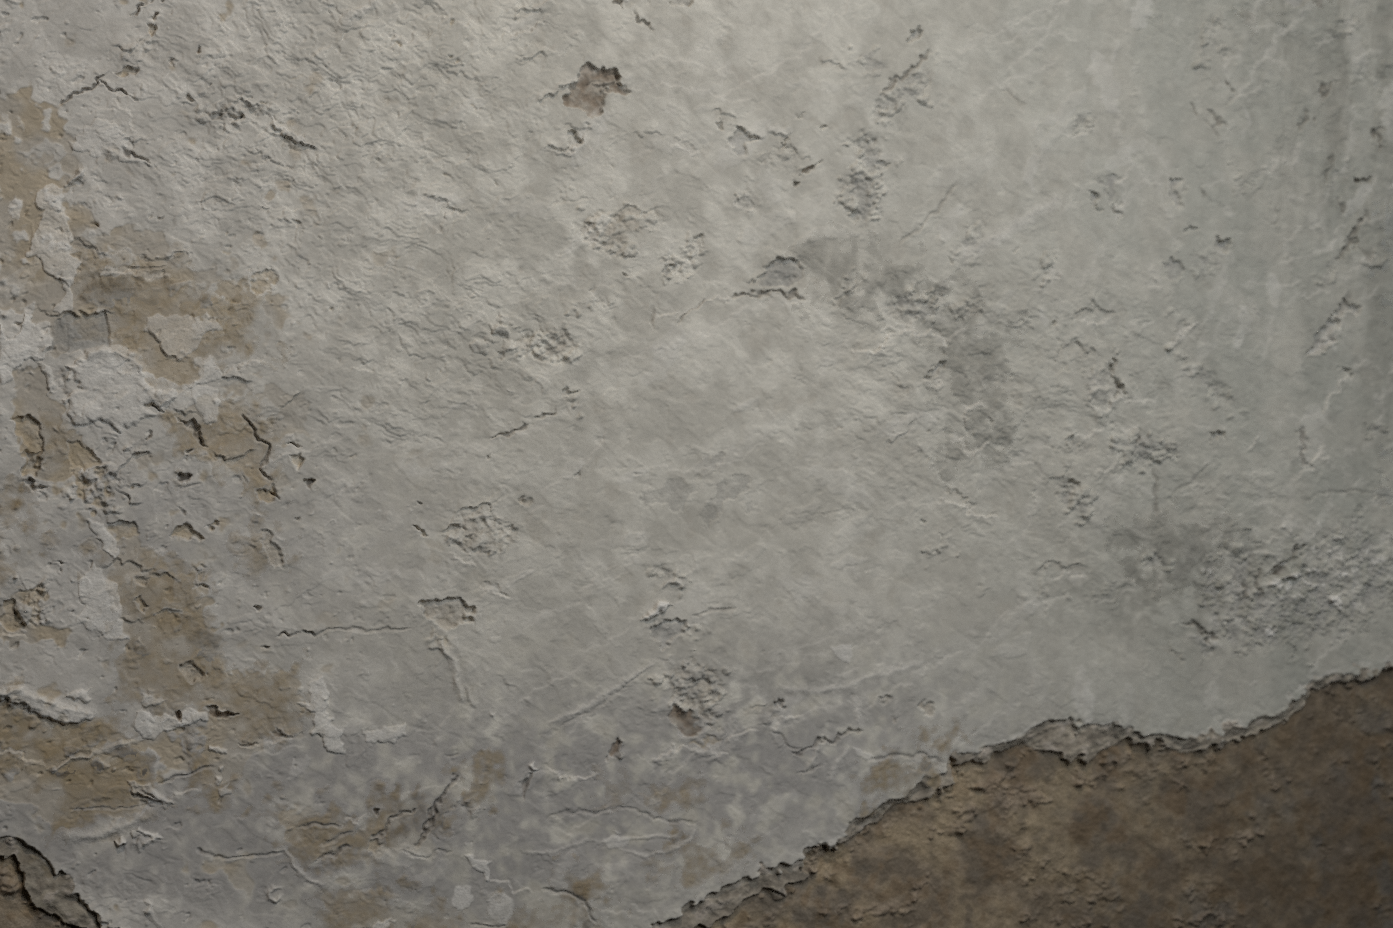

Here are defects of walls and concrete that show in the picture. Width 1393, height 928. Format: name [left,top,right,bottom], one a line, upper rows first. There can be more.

crack [60,73,140,106]
spalling [536,61,636,156]
crack [70,234,194,282]
crack [218,355,304,482]
spalling [411,494,535,709]
spalling [178,660,208,685]
spalling [640,564,805,765]
flaking render [134,693,243,742]
peeling [209,676,349,797]
spalling [605,735,625,764]
crack [74,764,218,813]
crack [198,844,328,889]